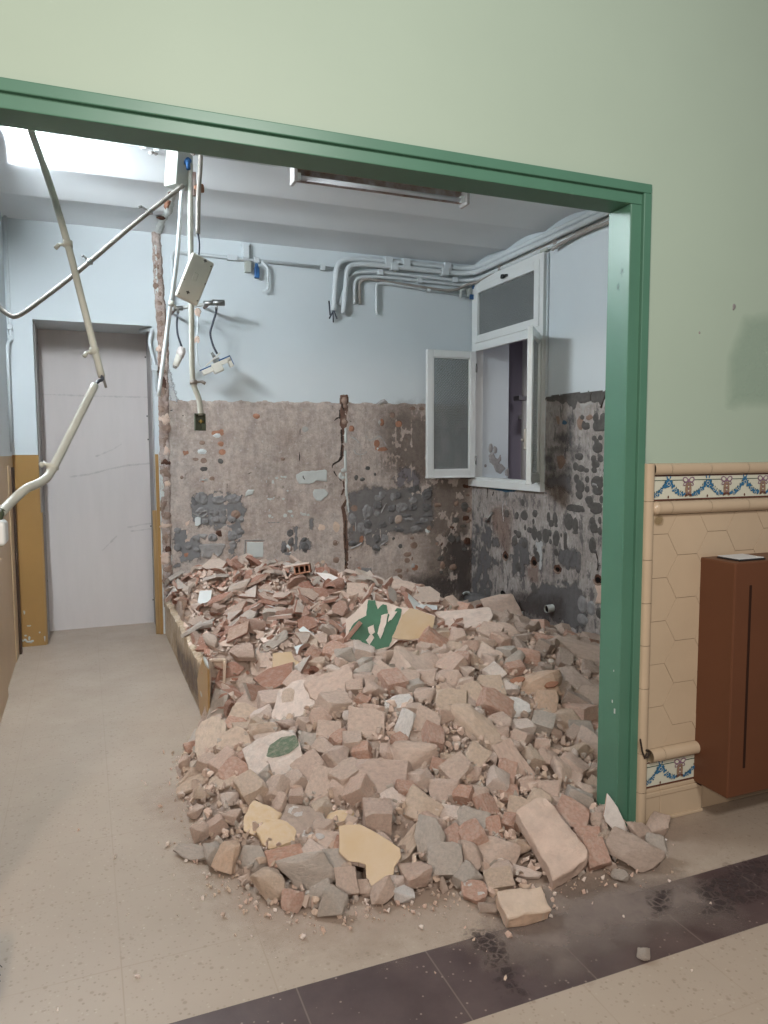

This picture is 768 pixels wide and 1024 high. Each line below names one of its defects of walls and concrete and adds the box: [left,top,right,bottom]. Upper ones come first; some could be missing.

crack [332,395,351,569]
flaking render [169,390,605,731]